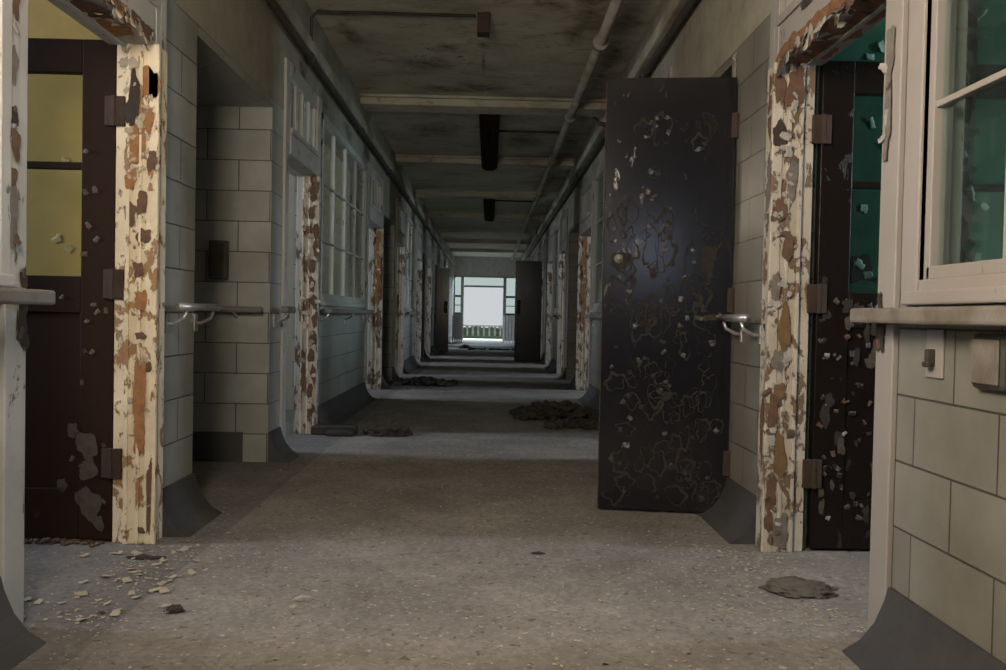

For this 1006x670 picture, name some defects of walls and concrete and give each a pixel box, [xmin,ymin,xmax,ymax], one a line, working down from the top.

peeling [12,0,20,85]
peeling [66,0,156,44]
peeling [7,105,22,250]
peeling [118,56,161,277]
peeling [763,0,895,262]
peeling [135,290,147,311]
peeling [299,182,321,416]
peeling [818,292,884,369]
peeling [57,423,106,532]
peeling [133,430,152,535]
peeling [758,271,796,549]
peeling [816,392,871,524]